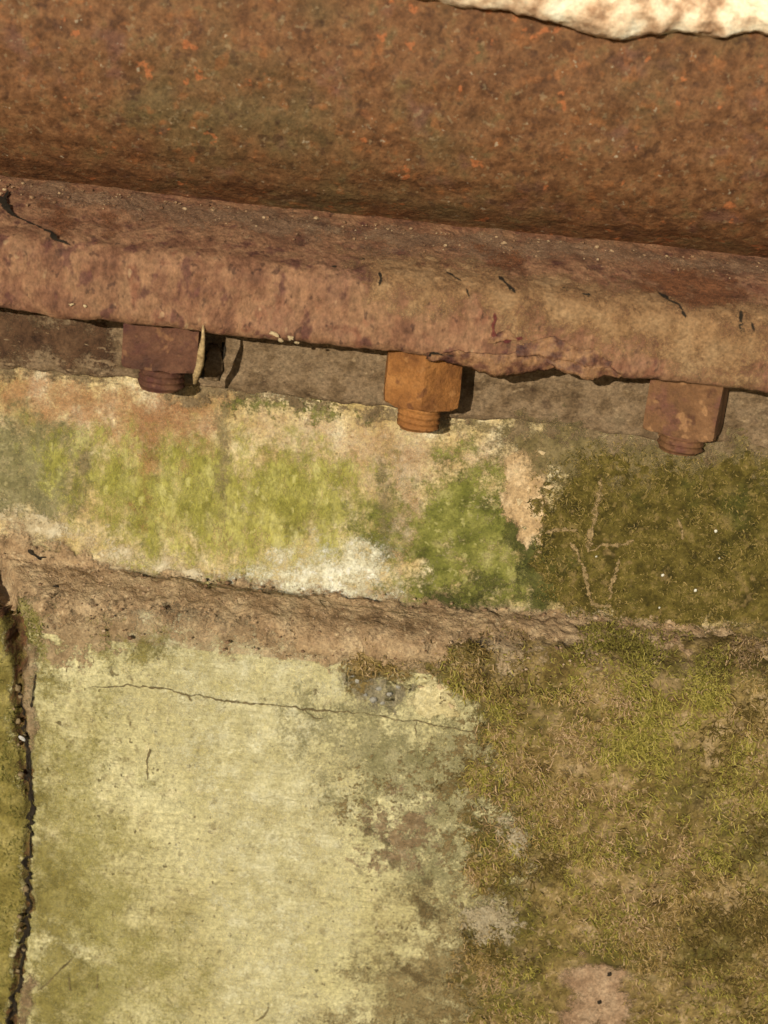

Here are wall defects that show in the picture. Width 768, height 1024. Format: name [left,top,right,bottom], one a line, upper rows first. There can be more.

crack [0,190,69,245]
damp [0,495,402,601]
crack [89,684,480,737]
crack [0,597,73,1024]